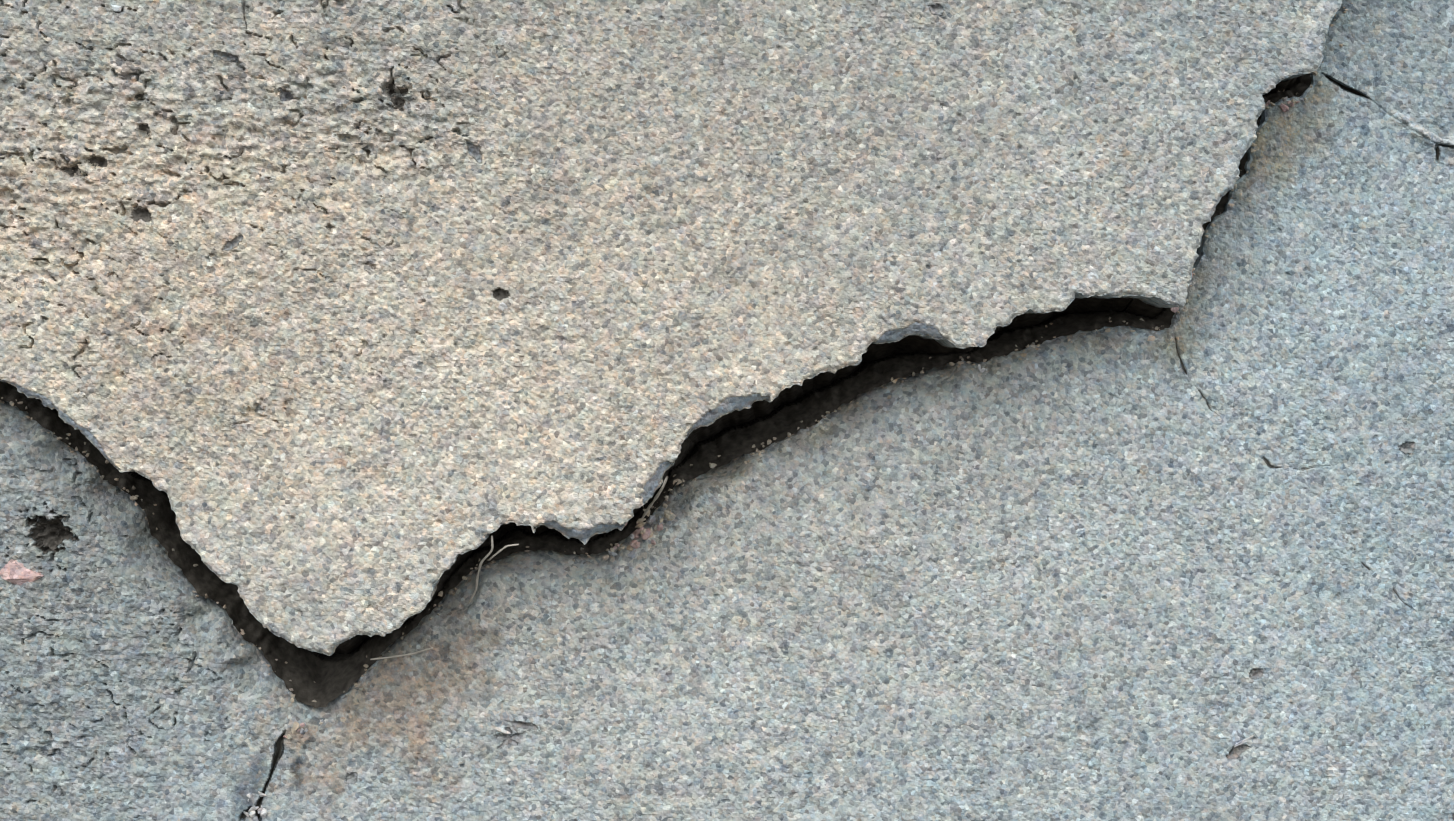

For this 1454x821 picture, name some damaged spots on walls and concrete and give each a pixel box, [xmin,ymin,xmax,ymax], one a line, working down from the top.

crack [1202,61,1369,238]
crack [1436,144,1454,160]
crack [0,248,1201,821]